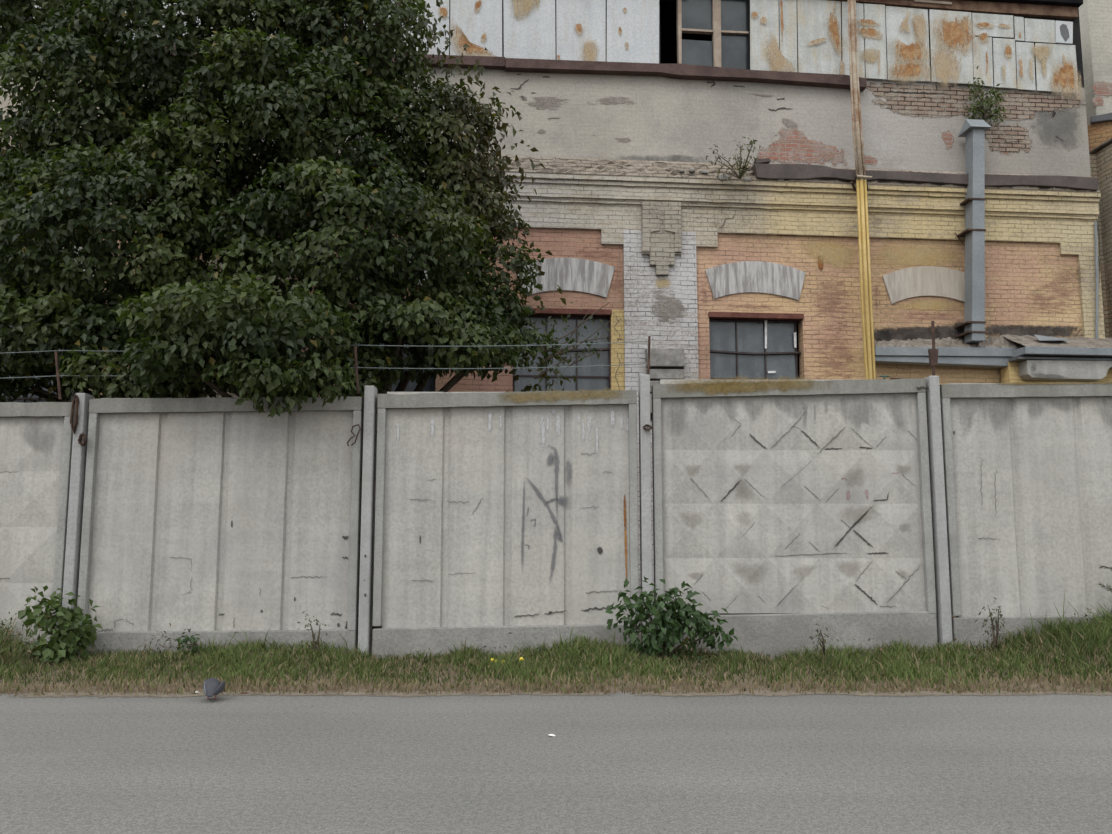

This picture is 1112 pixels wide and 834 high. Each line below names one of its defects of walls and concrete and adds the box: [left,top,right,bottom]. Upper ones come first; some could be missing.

corrosion [439,8,497,57]
corrosion [513,0,540,16]
corrosion [575,24,597,61]
corrosion [767,0,795,72]
corrosion [809,2,844,75]
corrosion [857,12,1021,85]
corrosion [1002,45,1081,95]
flaking render [757,118,846,166]
flaking render [866,81,1112,154]